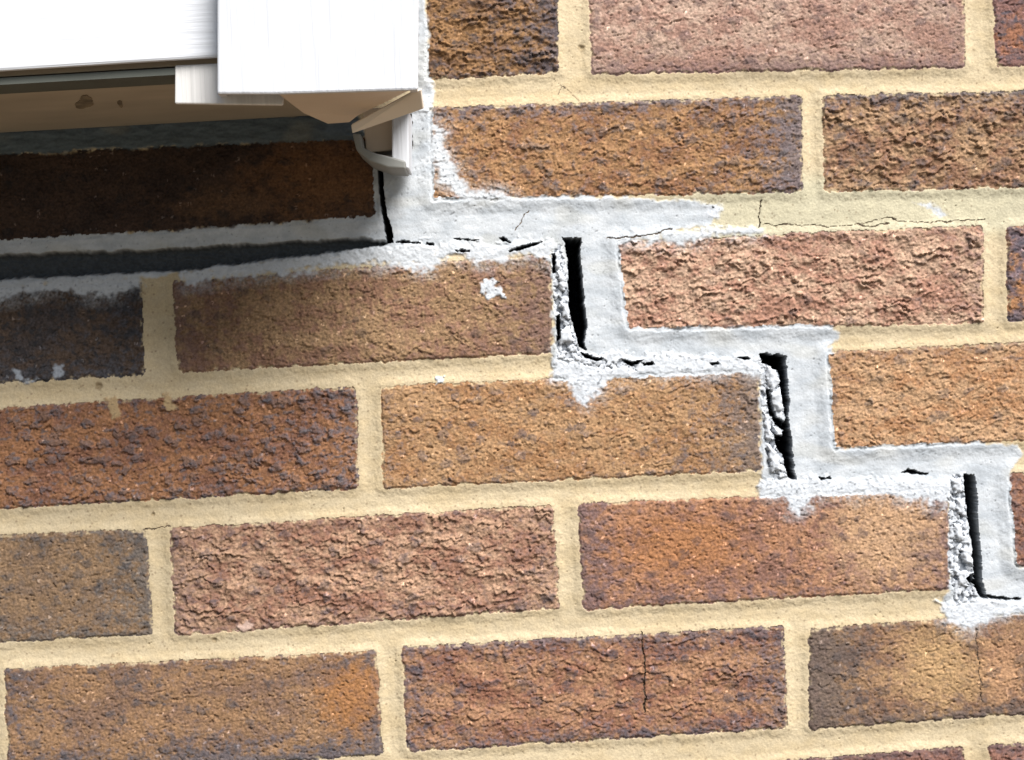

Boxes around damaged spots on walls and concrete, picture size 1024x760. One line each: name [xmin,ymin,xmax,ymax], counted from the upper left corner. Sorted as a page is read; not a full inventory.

crack [757,199,986,228]
crack [709,352,832,481]
crack [901,467,929,476]
crack [963,473,1022,602]